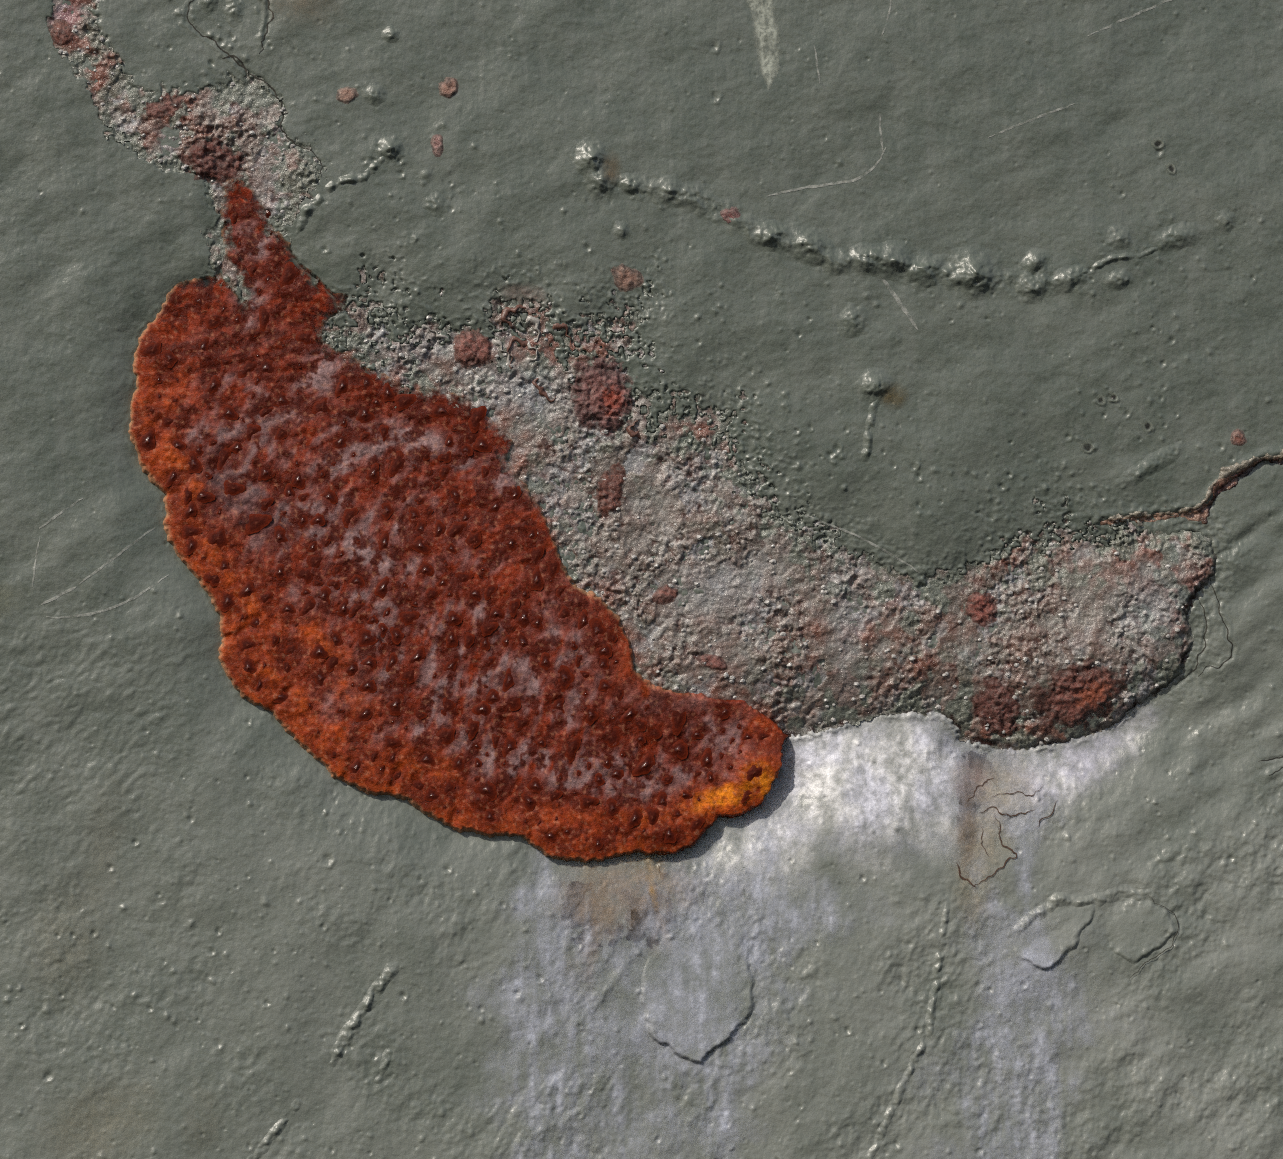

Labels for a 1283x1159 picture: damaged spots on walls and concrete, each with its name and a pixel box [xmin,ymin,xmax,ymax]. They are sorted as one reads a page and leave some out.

peeling [46,0,327,307]
rust [128,179,788,863]
peeling [314,267,1217,751]
crack [1100,449,1283,525]
leakage [987,724,1133,831]
leakage [634,722,965,1132]
leakage [505,940,572,1046]
leakage [528,1068,565,1117]
leakage [973,1031,1054,1157]